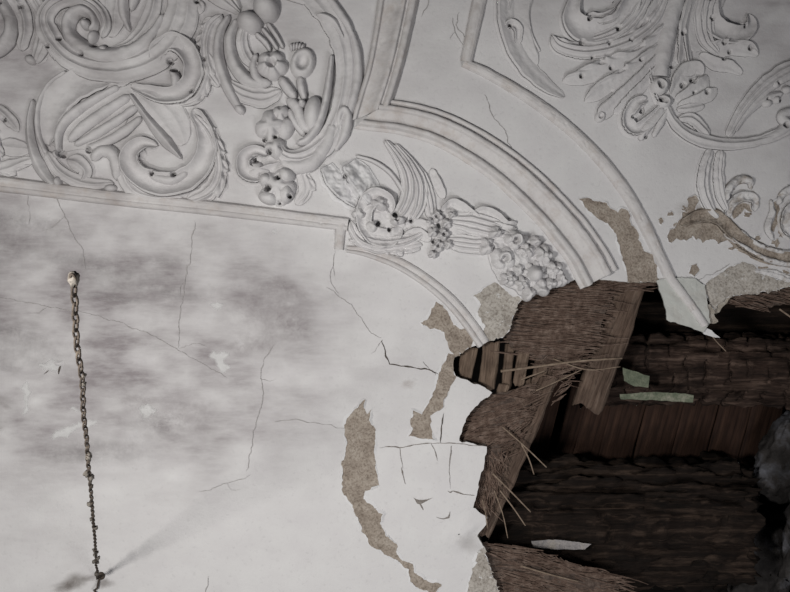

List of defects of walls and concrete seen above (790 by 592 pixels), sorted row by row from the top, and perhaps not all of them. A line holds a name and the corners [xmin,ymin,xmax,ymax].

crack [0,221,225,377]
crack [330,258,438,375]
flaking render [472,282,522,341]
flaking render [578,197,660,283]
flaking render [658,194,738,251]
flaking render [732,203,752,219]
flaking render [705,262,790,309]
crack [199,346,344,492]
flaking render [339,398,441,592]
crack [382,414,482,519]
flaking render [407,300,473,442]
flaking render [465,547,500,592]